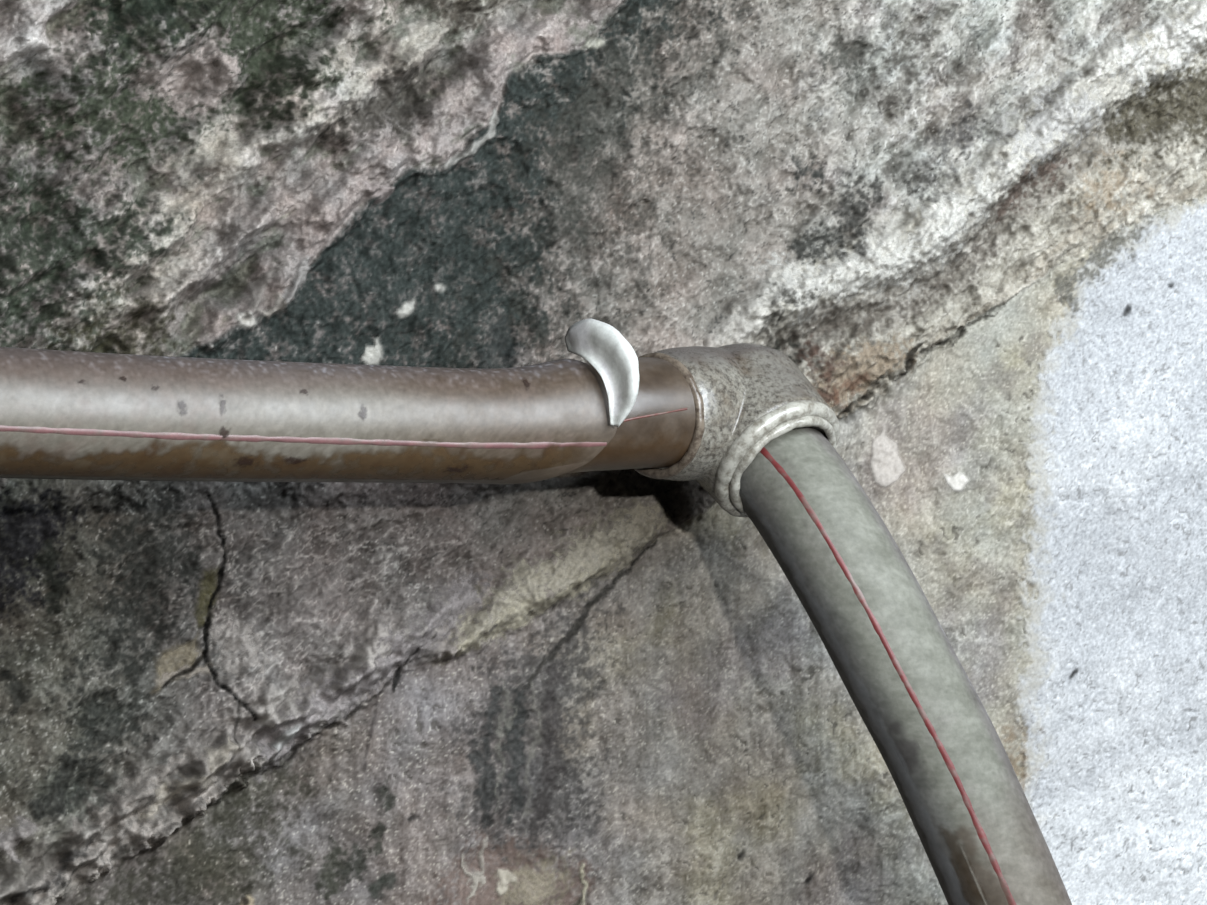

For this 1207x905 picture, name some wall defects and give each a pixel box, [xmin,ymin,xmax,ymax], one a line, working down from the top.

crack [837,316,988,418]
crack [163,495,258,742]